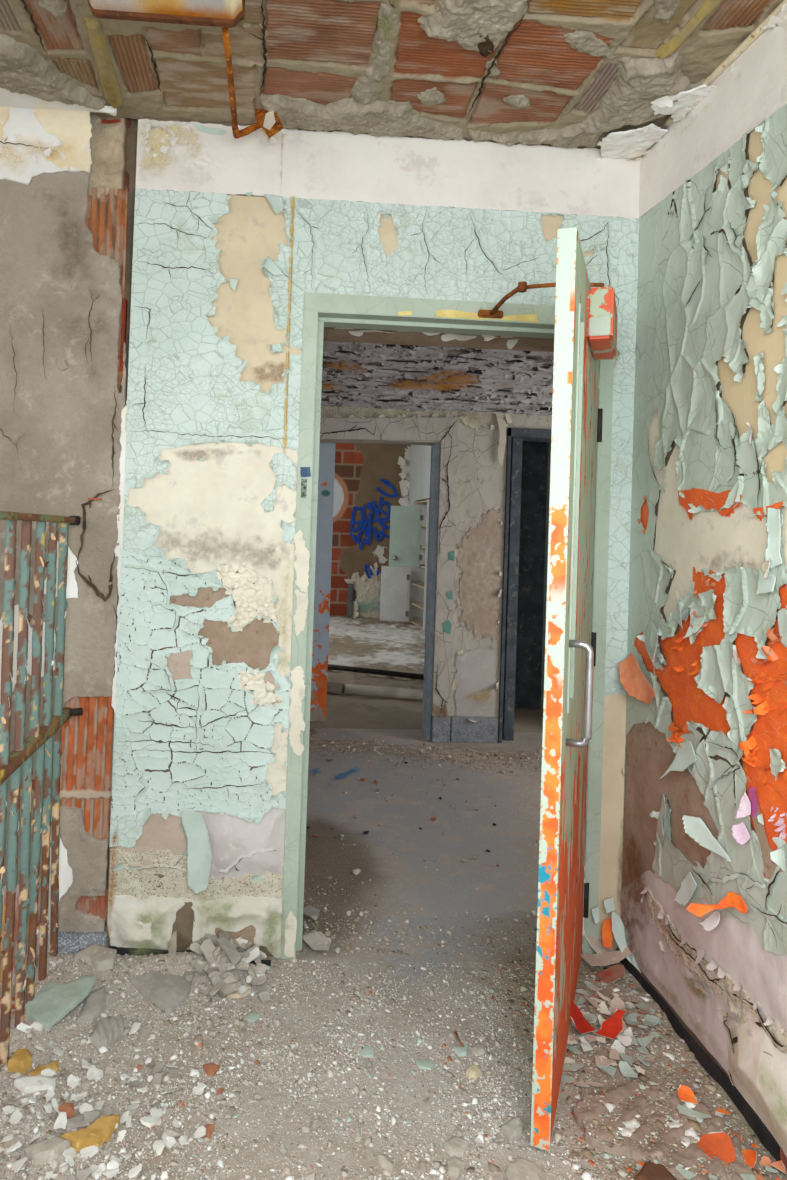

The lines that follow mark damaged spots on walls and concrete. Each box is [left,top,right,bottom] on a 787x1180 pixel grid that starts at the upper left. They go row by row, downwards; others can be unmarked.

peeling [643,85,717,132]
crack [139,261,210,278]
crack [140,192,215,239]
crack [267,200,318,291]
peeling [716,165,729,190]
peeling [740,123,787,268]
peeling [718,254,787,482]
flaking render [0,106,311,798]
peeling [443,507,505,722]
flaking render [0,747,284,951]
peeling [284,911,297,958]
peeling [677,1085,731,1119]